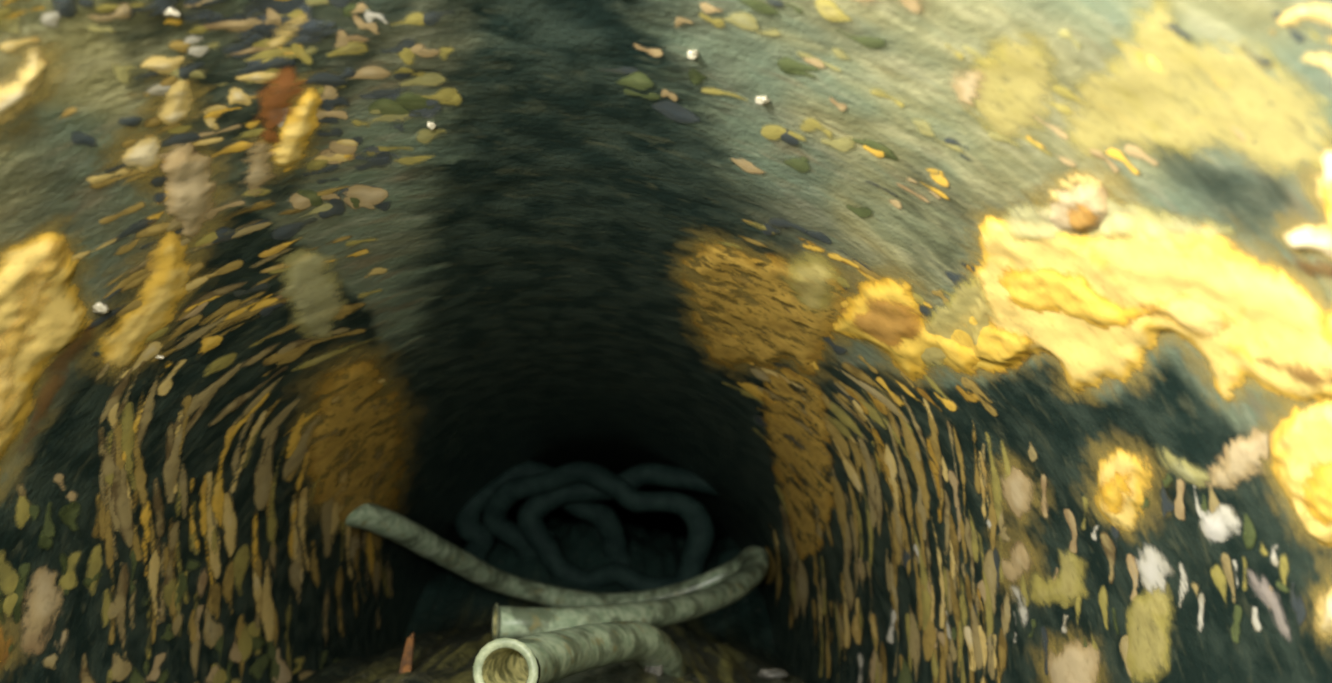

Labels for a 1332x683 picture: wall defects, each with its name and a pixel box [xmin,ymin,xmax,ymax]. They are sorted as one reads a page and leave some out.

corrosion [1161,21,1191,40]
corrosion [1241,45,1273,68]
corrosion [1022,86,1091,139]
corrosion [914,120,969,160]
corrosion [677,132,1332,683]